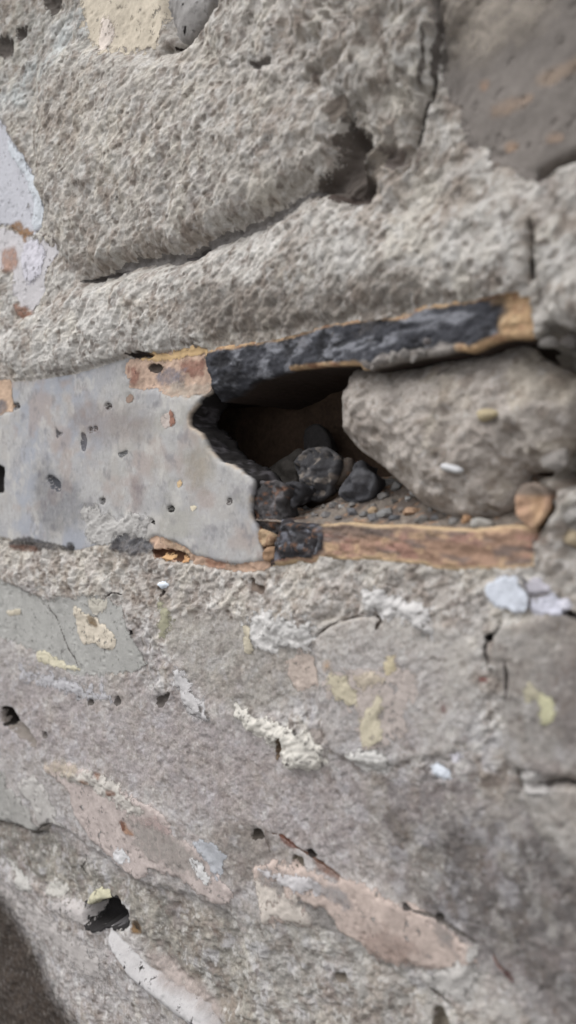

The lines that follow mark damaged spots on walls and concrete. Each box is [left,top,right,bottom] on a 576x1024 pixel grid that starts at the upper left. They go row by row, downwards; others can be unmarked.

crack [407,9,443,171]
flaking render [0,120,59,313]
spalling [0,379,20,415]
spalling [81,426,98,451]
spalling [161,410,175,428]
spalling [125,345,212,403]
spalling [48,475,61,492]
spalling [515,482,557,530]
flaking render [80,498,271,594]
flaking render [0,872,119,999]
flaking render [251,855,481,1024]